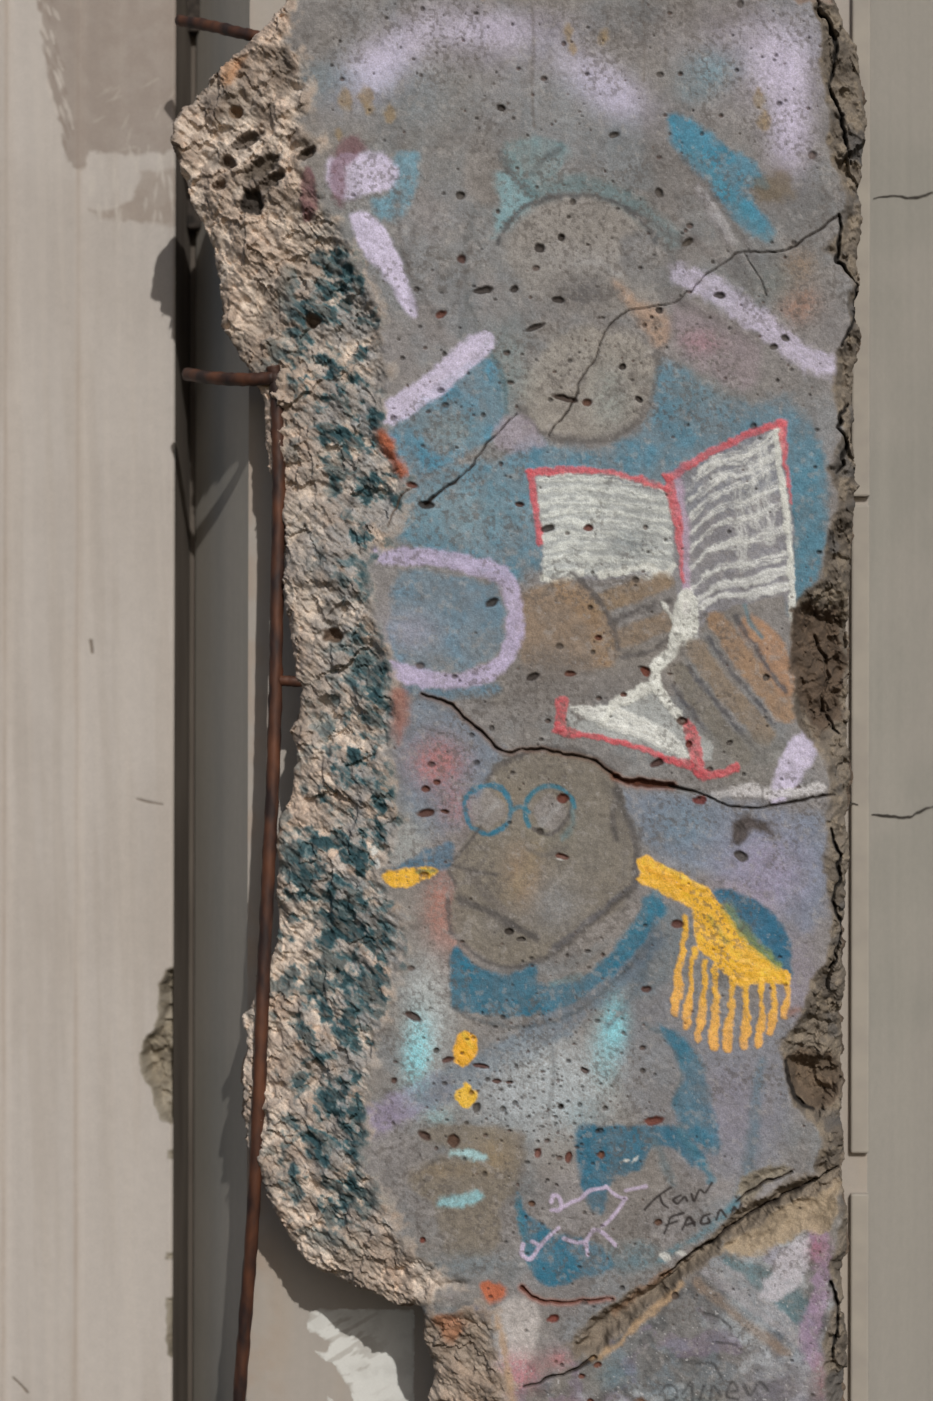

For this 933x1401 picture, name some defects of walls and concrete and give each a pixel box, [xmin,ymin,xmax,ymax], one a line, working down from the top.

crack [873,191,933,199]
crack [849,803,933,819]